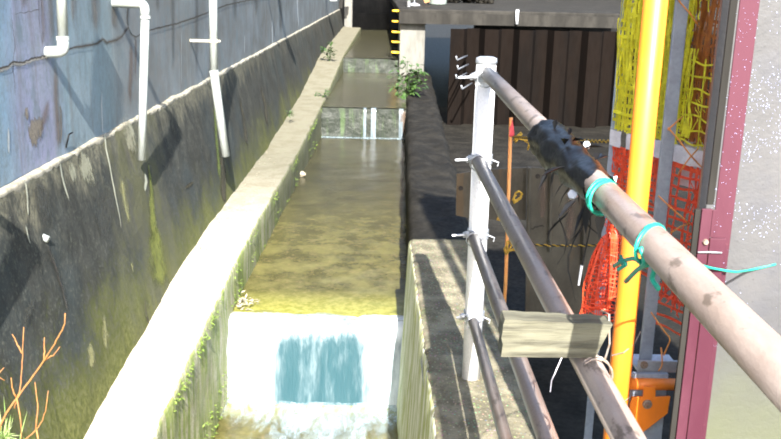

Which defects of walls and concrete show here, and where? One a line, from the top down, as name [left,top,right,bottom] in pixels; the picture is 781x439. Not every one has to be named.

crack [69,0,251,50]
crack [0,8,46,93]
peeling [25,107,44,147]